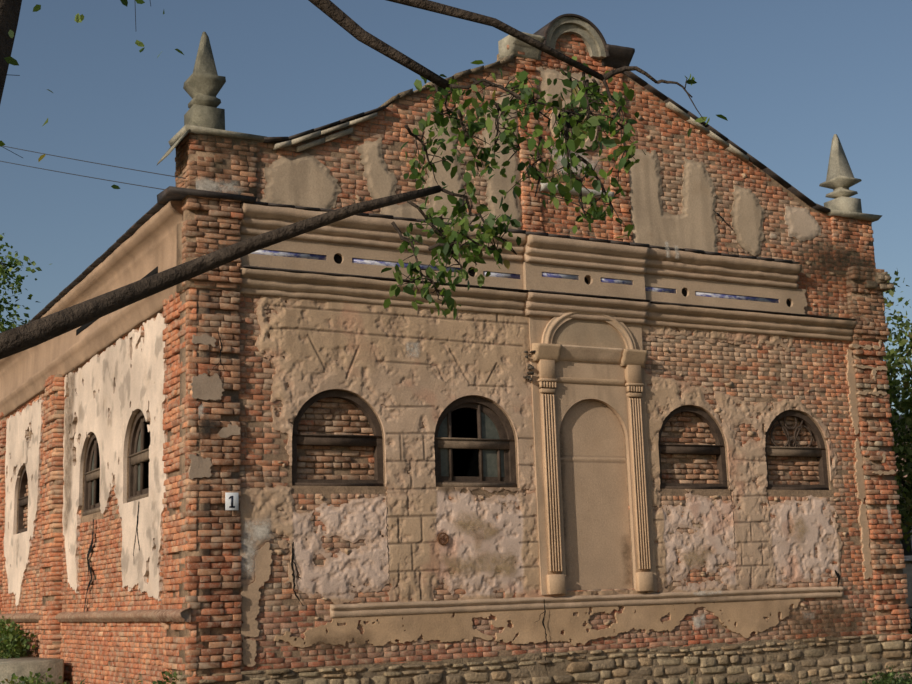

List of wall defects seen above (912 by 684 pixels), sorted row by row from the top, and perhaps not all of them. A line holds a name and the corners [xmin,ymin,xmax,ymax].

spalling [257,62,516,214]
spalling [529,58,629,240]
spalling [622,79,836,275]
crack [212,331,225,371]
spalling [238,294,877,671]
crack [291,542,304,606]
crack [534,600,548,676]